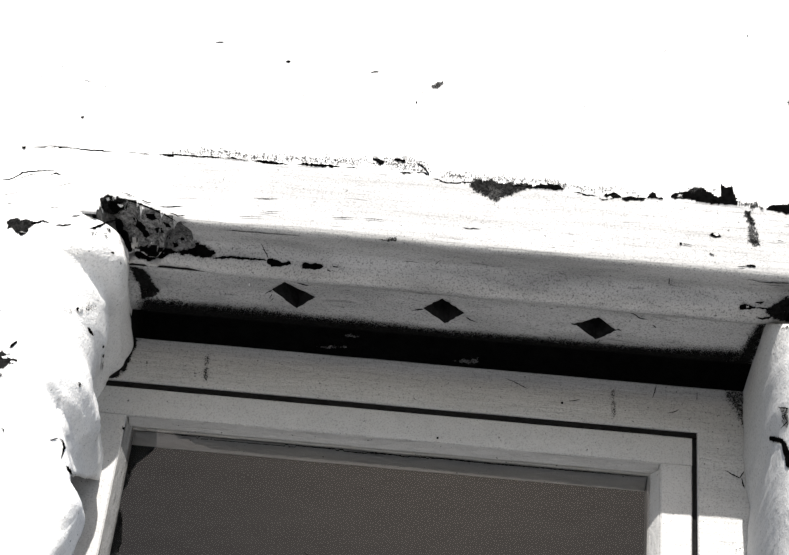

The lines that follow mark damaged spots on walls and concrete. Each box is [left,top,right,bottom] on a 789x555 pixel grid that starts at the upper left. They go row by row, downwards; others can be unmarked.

spalling [514,177,569,190]
spalling [107,198,124,214]
spalling [599,184,740,206]
spalling [766,196,789,214]
spalling [146,214,185,247]
spalling [0,341,18,377]